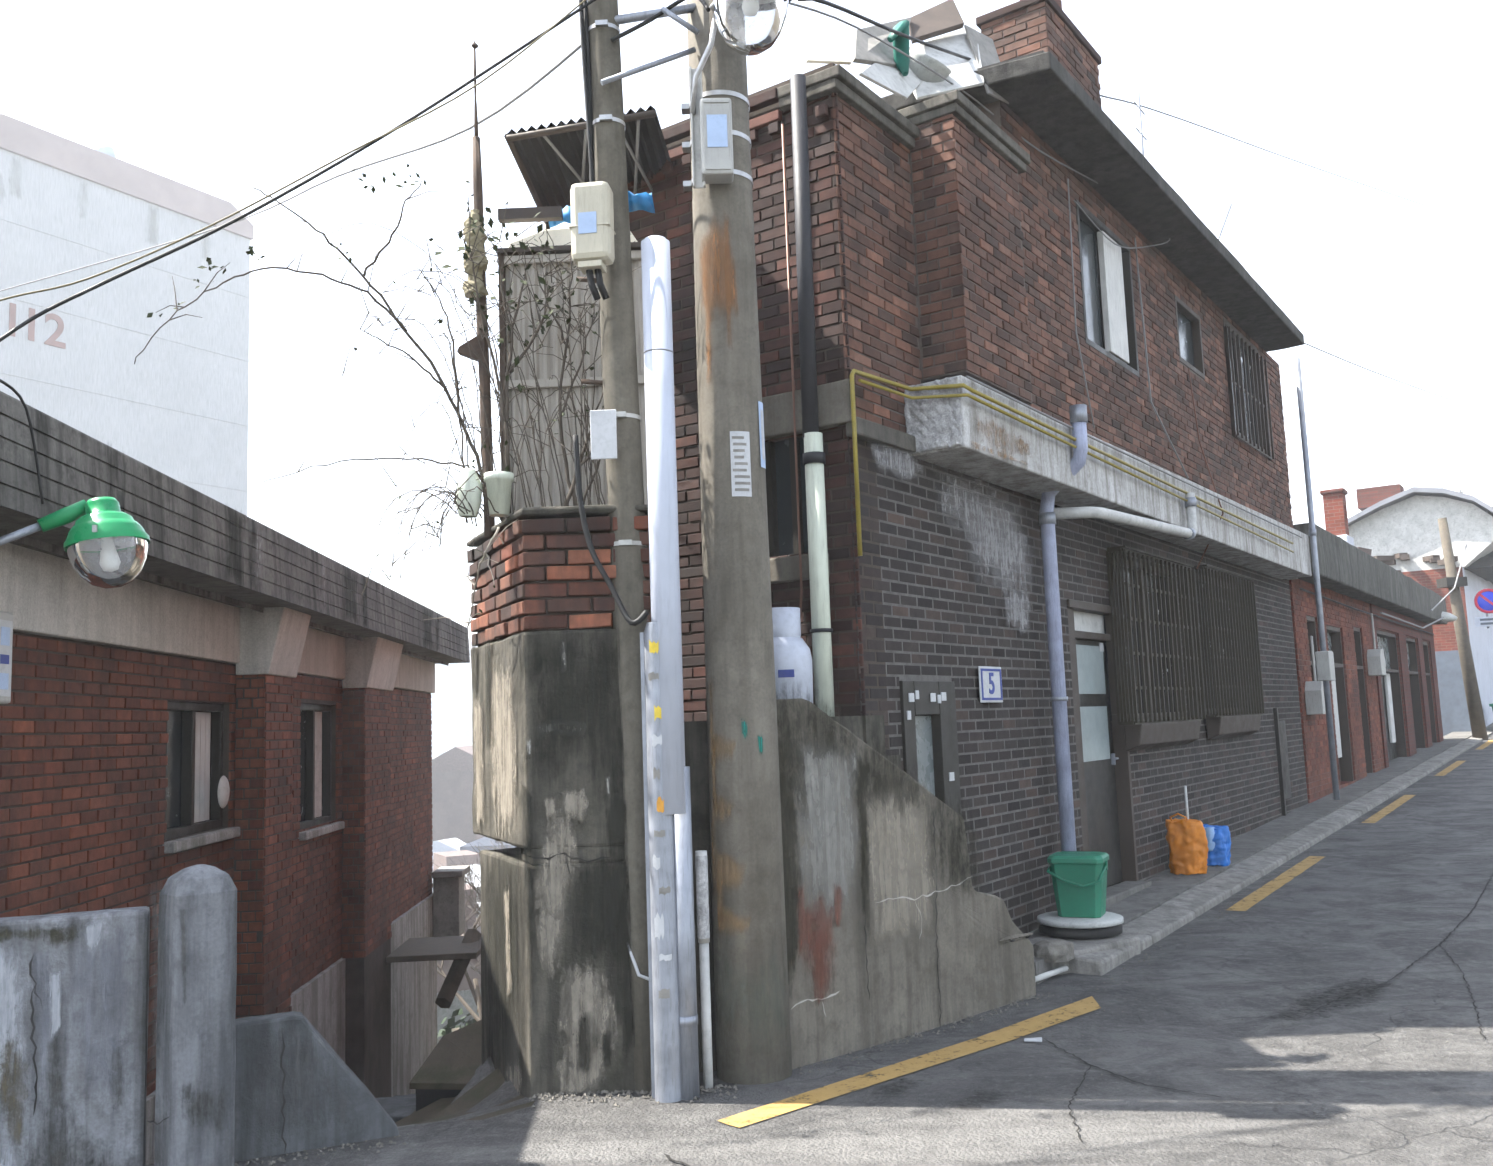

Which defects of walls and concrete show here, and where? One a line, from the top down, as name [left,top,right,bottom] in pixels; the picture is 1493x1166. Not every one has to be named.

corrosion [701,223,737,371]
efflorescence [875,443,923,477]
efflorescence [938,473,1030,631]
water stain [472,642,490,747]
water stain [481,789,533,1094]
water stain [528,637,635,1070]
corrosion [798,886,842,1002]
crack [794,817,970,1027]
crack [29,955,42,1116]